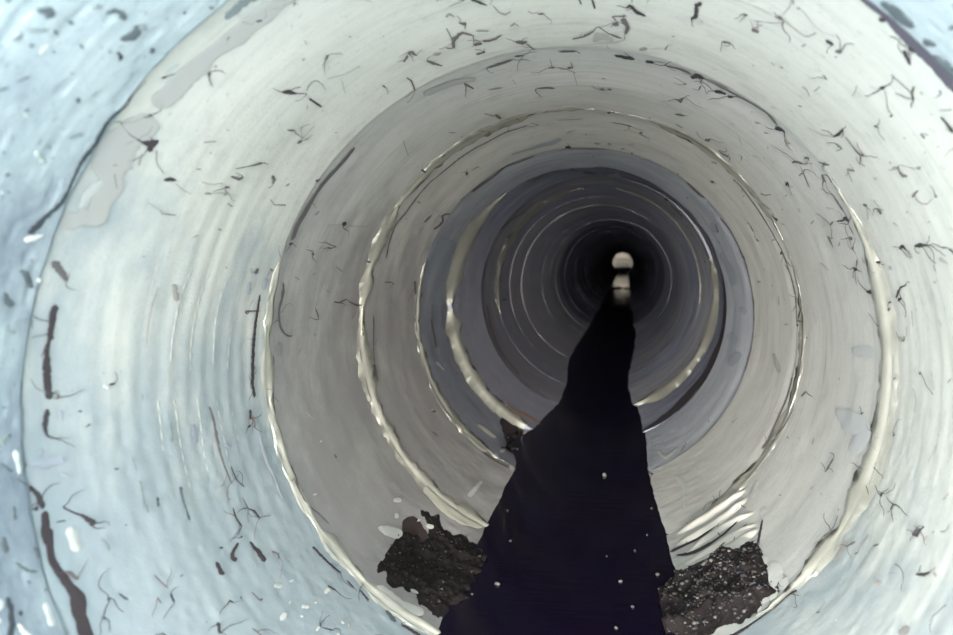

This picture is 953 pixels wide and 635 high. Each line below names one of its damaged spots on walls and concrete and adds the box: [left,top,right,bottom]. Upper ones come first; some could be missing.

spalling [378,497,434,543]
peeling [376,585,424,616]
peeling [757,555,789,613]